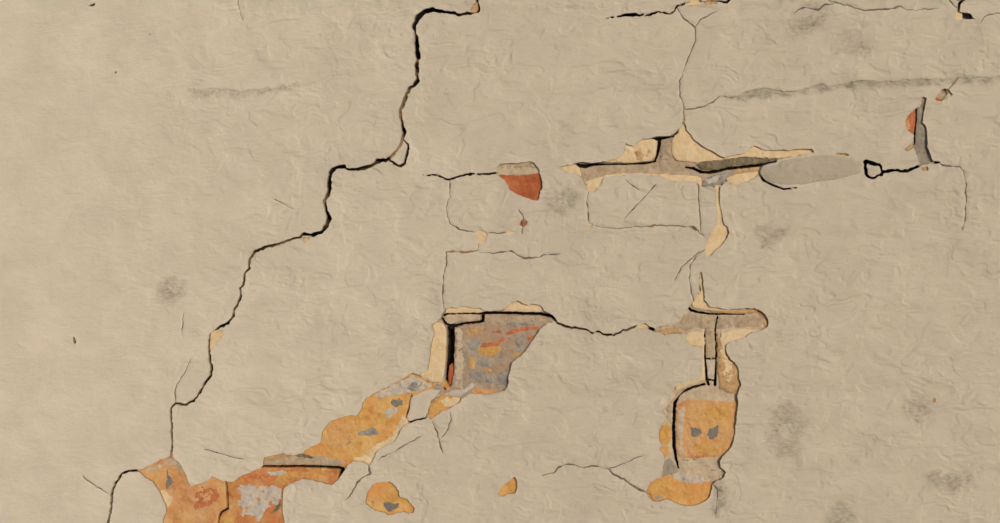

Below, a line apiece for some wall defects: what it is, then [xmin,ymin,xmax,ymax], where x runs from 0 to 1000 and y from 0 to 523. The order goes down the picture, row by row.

crack [608,0,730,122]
crack [171,0,480,452]
crack [428,172,559,307]
spalling [496,161,543,201]
spalling [561,122,814,256]
crack [863,159,967,227]
spalling [904,89,952,166]
crack [547,314,655,336]
crack [83,469,138,523]
spalling [137,301,559,523]
crack [344,414,452,501]
spalling [646,272,768,505]